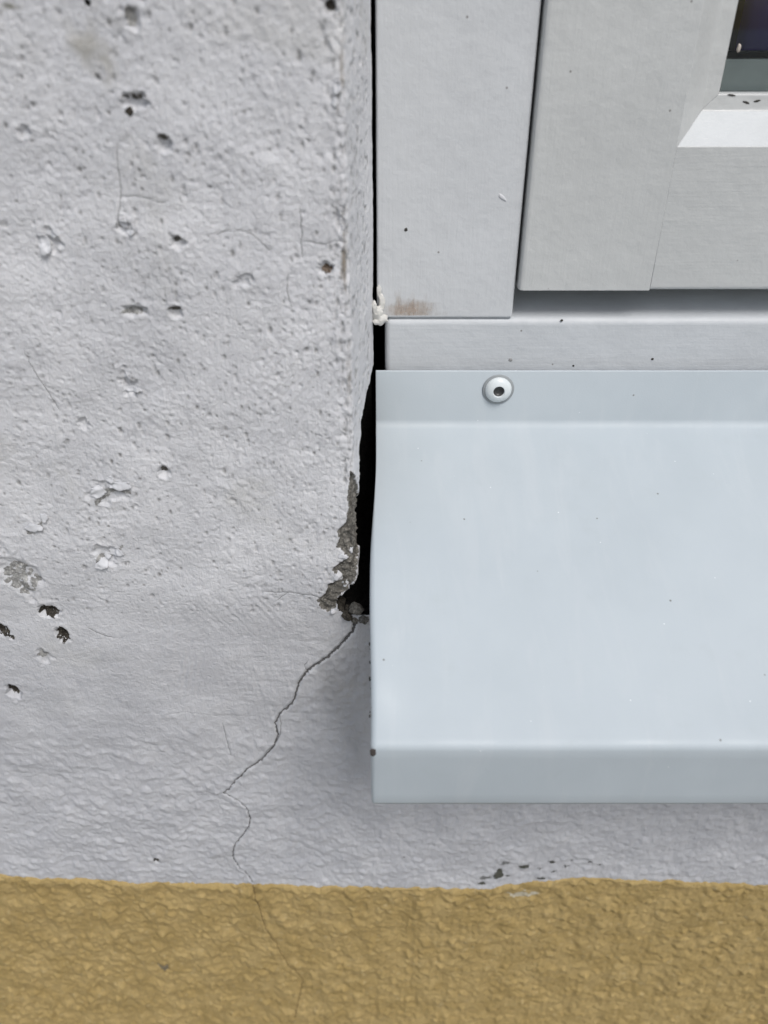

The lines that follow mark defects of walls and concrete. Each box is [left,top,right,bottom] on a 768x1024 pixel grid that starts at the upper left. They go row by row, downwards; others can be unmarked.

spalling [317,471,360,612]
spalling [3,560,42,594]
spalling [0,624,15,639]
spalling [38,605,70,644]
crack [199,623,356,1017]